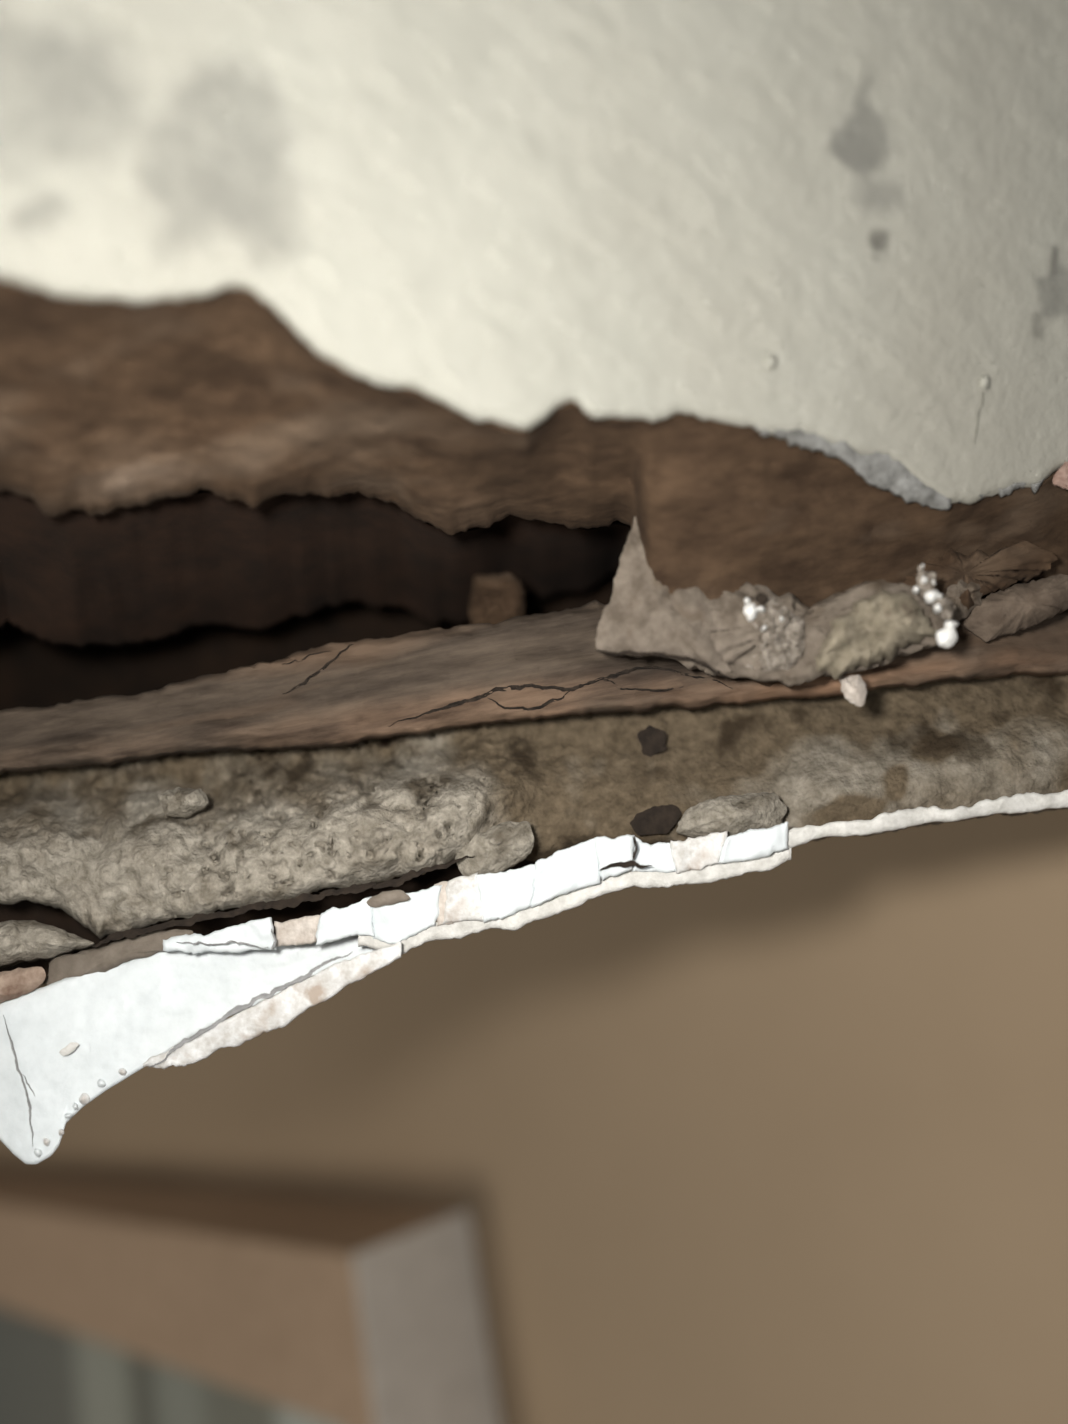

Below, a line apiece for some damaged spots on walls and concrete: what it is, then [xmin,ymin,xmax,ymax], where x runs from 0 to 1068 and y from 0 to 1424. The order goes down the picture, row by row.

spalling [0,280,1068,1164]